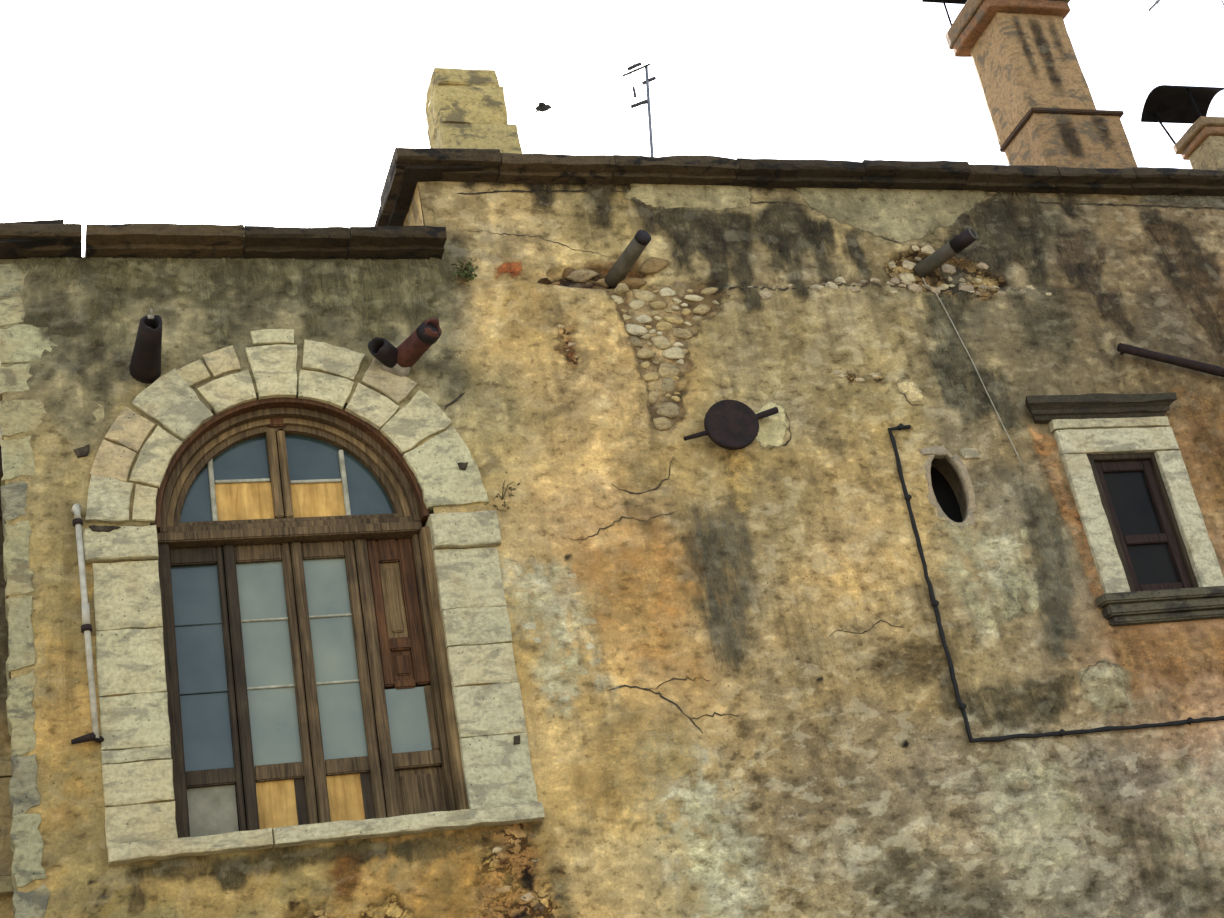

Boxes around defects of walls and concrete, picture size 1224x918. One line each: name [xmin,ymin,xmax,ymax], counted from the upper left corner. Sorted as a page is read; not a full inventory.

leakage [464,181,870,310]
spalling [727,245,1062,300]
crack [569,510,678,540]
leakage [683,506,752,663]
crack [605,677,739,733]
spalling [458,823,563,918]
spalling [289,887,344,918]
spalling [362,894,411,918]